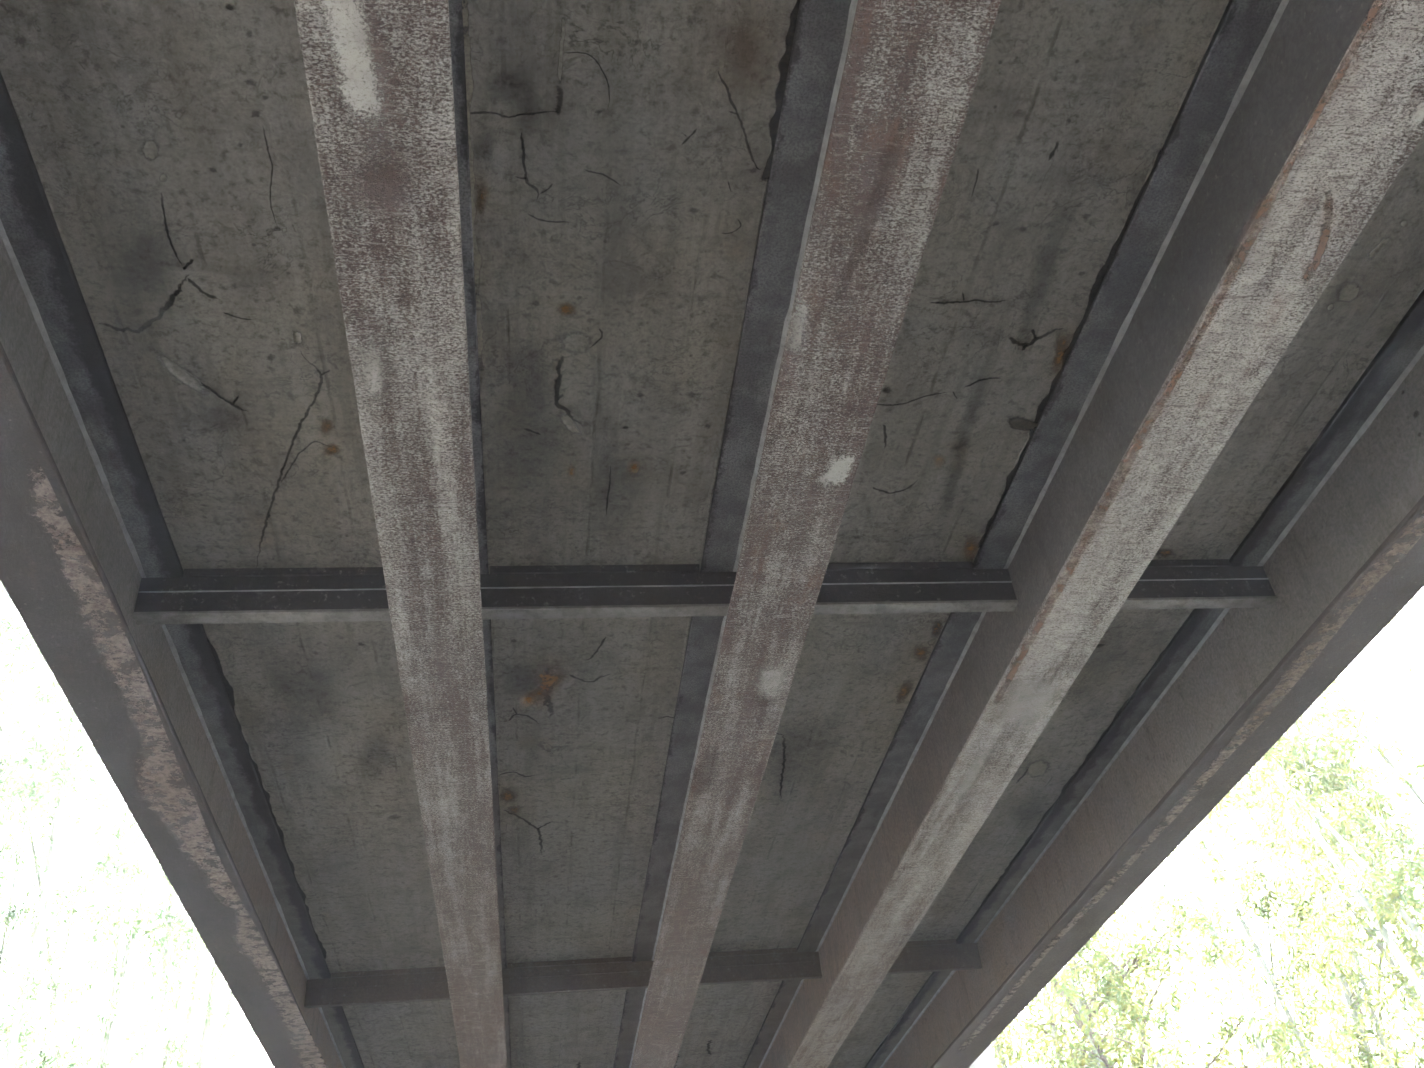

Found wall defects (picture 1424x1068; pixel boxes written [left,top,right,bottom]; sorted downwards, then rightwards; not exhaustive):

crack [470,111,566,223]
crack [718,71,761,234]
crack [99,194,251,333]
crack [526,328,603,435]
corrosion [996,0,1385,704]
crack [257,353,330,564]
crack [508,637,610,724]
peeling [21,451,327,1068]
crack [503,810,550,851]